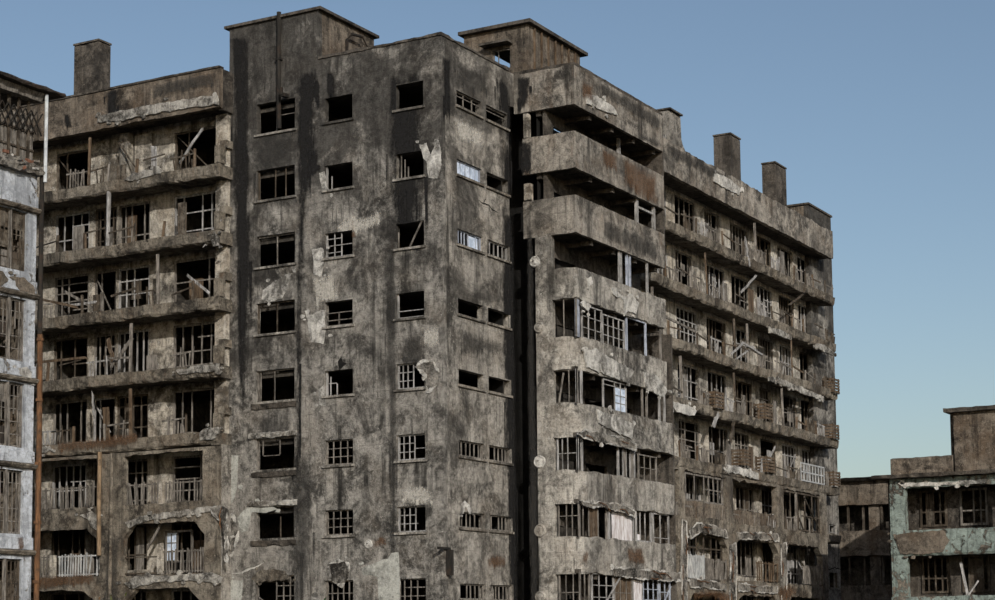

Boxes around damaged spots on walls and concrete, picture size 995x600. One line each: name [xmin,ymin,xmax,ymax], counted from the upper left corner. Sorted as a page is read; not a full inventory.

spalling [95,92,219,125]
peeling [585,94,618,119]
leakage [386,74,428,236]
peeling [416,139,441,179]
leakage [231,38,335,600]
leakage [385,250,424,551]
spalling [414,359,439,393]
peeling [582,347,697,416]
spalling [116,570,234,589]
spalling [125,505,239,564]
spalling [610,519,788,600]
peeling [887,528,950,559]